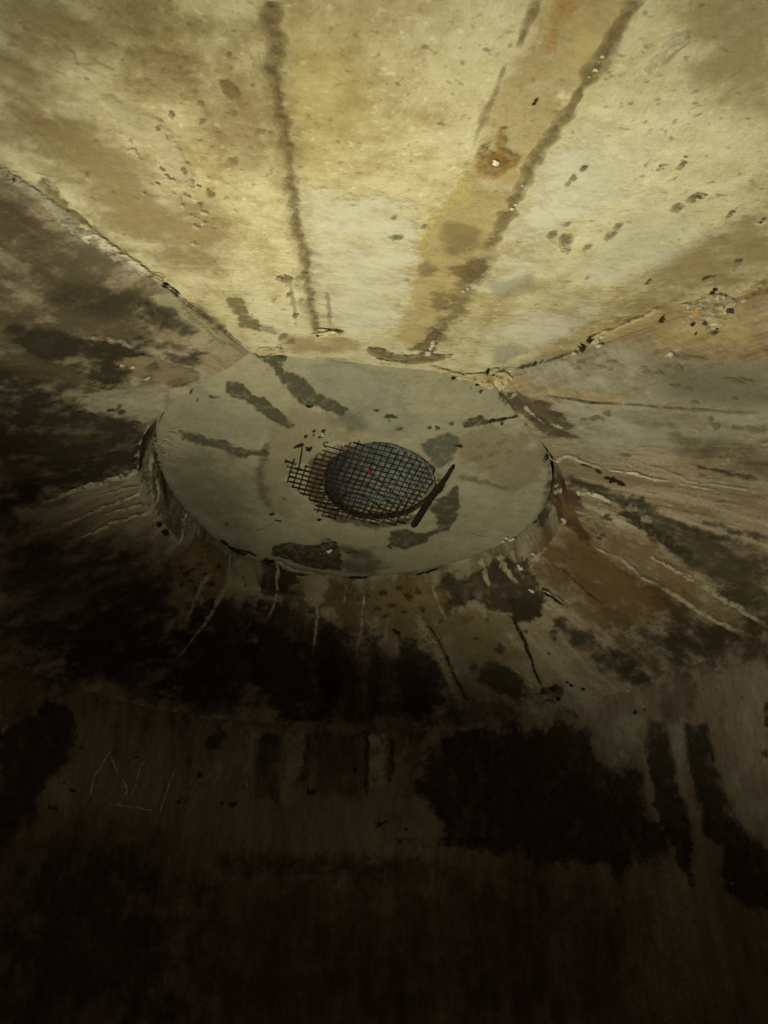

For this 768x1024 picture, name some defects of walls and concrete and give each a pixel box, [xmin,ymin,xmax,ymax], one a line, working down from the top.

rust [525,0,628,81]
water stain [16,118,223,269]
water stain [260,6,418,331]
rust [398,183,509,344]
rust [474,107,542,182]
water stain [487,2,638,254]
crack [501,310,661,371]
spalling [680,284,768,335]
water stain [0,169,768,908]
crack [513,619,541,684]